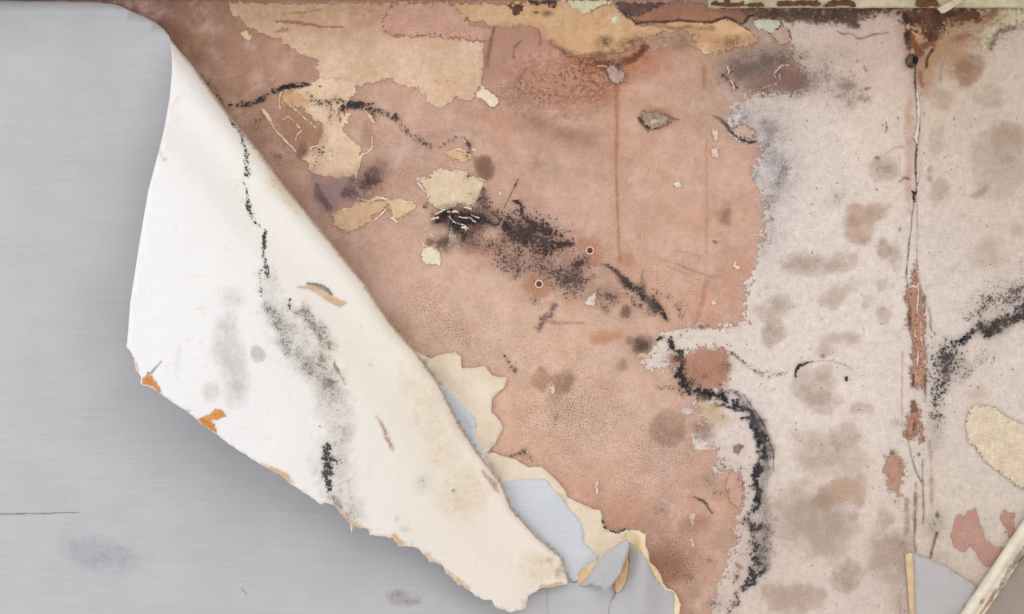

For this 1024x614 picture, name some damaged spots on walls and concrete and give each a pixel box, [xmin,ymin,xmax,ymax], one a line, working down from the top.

flaking render [381,0,493,43]
water stain [207,82,684,331]
flaking render [475,50,619,125]
peeling [507,0,668,24]
water stain [720,45,871,254]
crack [906,68,920,287]
peeling [126,41,568,612]
water stain [924,268,1024,429]
water stain [634,335,863,614]